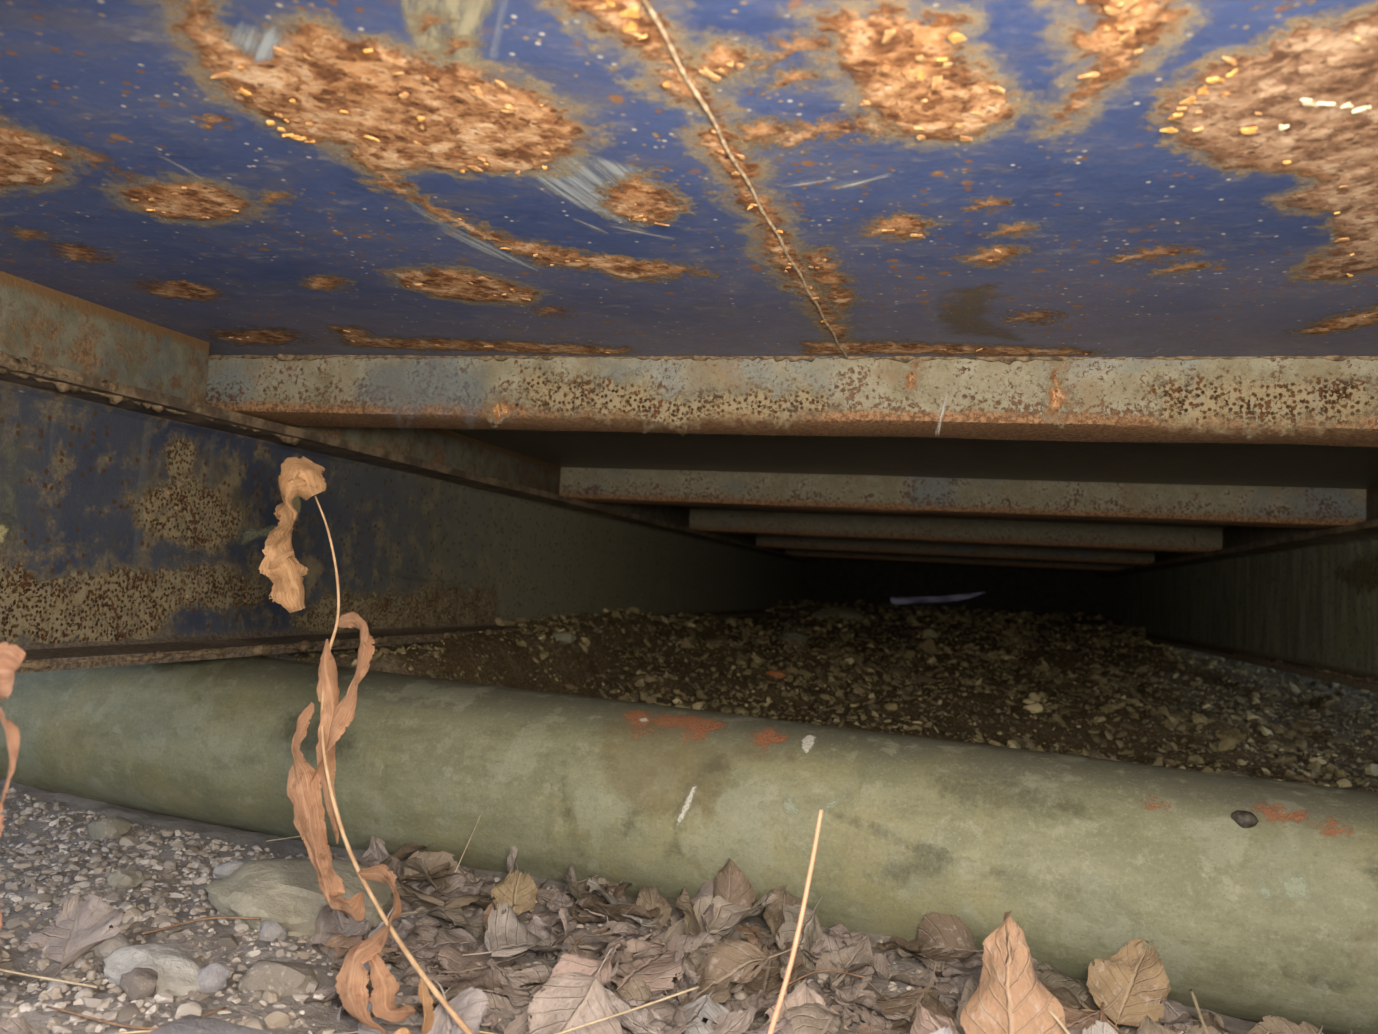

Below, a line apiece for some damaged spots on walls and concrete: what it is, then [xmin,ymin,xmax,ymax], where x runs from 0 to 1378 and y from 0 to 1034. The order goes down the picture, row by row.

corrosion [0,116,301,228]
corrosion [155,0,1378,432]